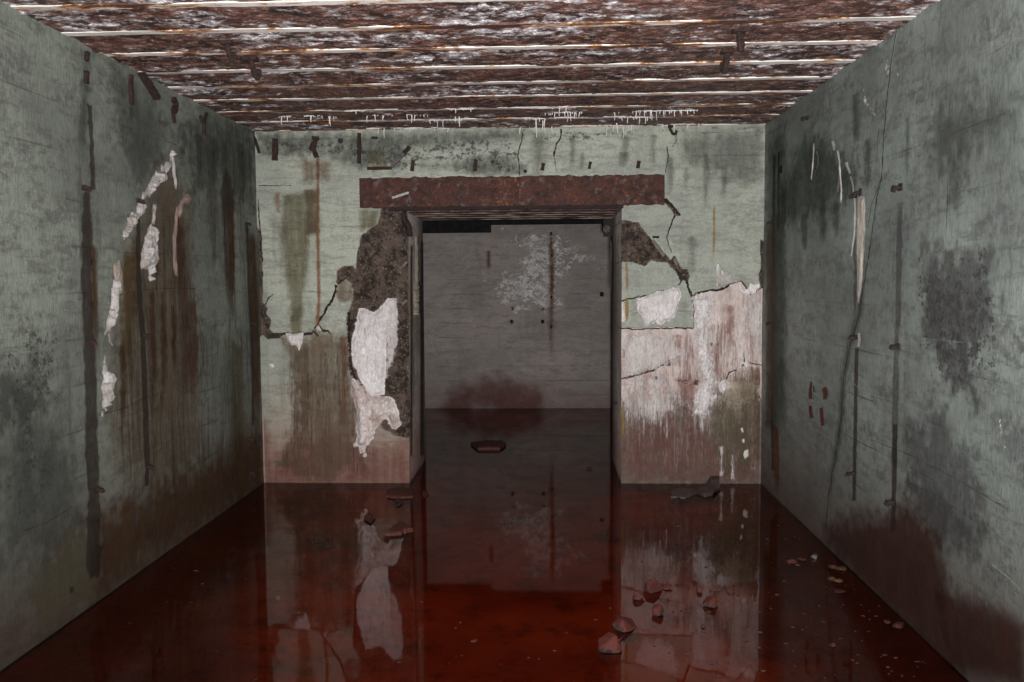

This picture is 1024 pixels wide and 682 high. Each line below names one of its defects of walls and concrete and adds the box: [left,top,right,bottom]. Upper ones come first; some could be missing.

damp [122,150,191,281]
crack [258,185,291,261]
crack [282,285,367,394]
spalling [337,208,411,437]
damp [482,227,612,315]
spalling [621,220,690,281]
crack [624,360,696,384]
crack [665,198,681,253]
damp [621,264,761,479]
crack [621,280,763,302]
flaking render [621,240,763,416]